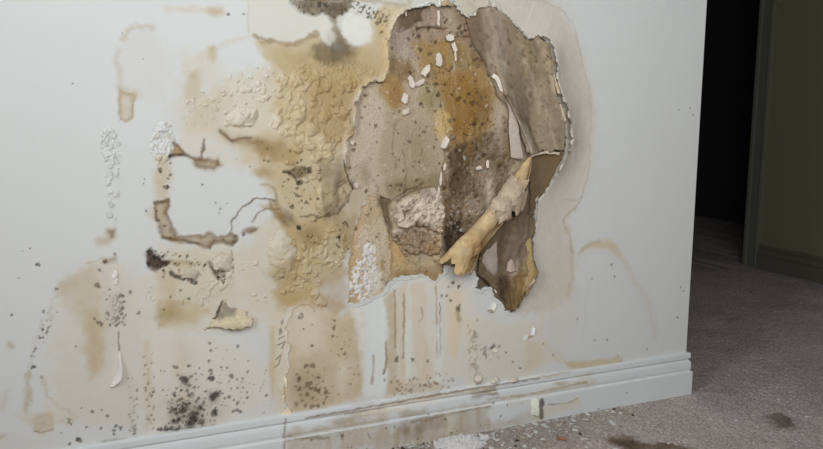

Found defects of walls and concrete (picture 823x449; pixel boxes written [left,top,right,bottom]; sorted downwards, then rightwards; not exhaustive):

peeling [110,330,123,388]
peeling [203,299,254,331]
damp [0,0,501,449]
spalling [340,0,533,313]
damp [279,0,659,449]
damp [602,432,697,449]